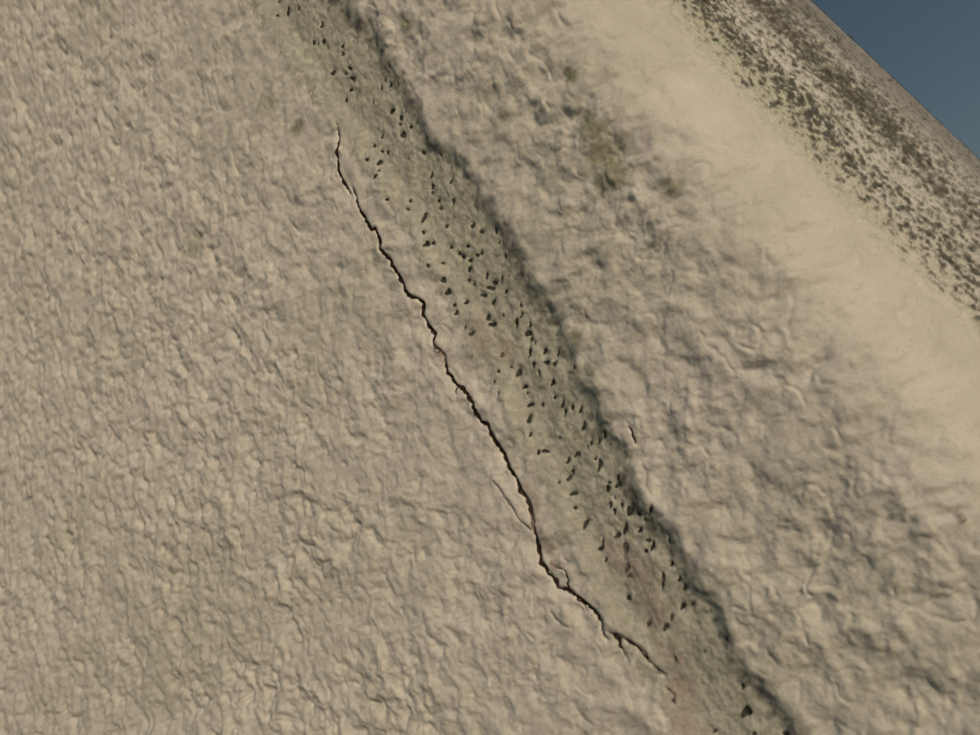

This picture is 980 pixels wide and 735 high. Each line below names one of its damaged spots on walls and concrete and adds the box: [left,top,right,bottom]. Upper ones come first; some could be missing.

crack [335,126,676,703]